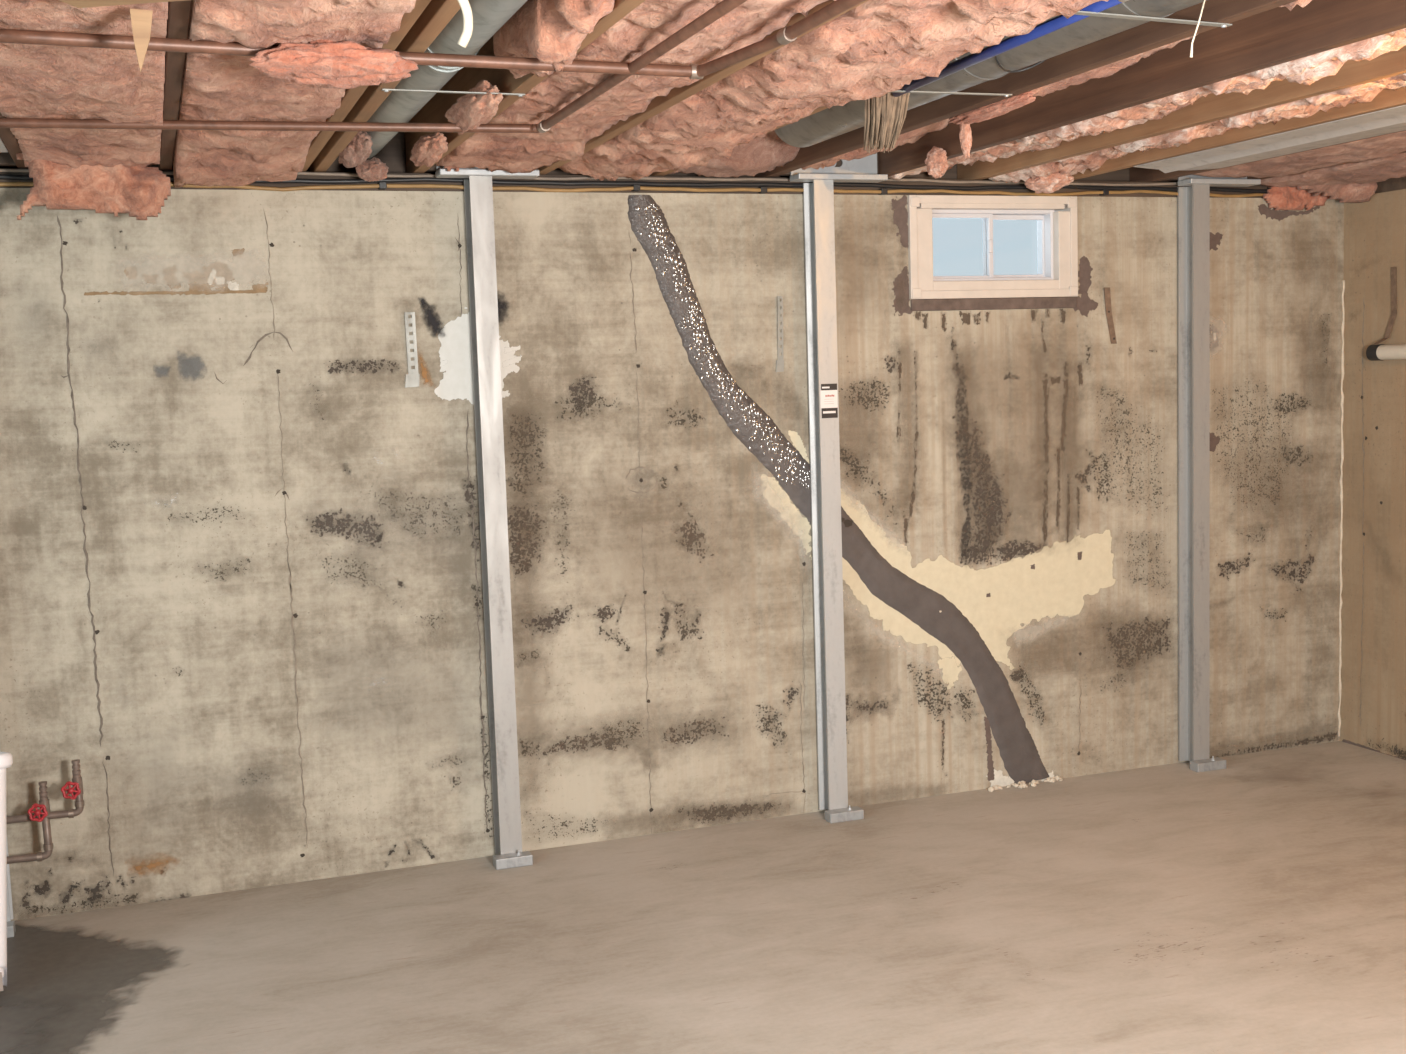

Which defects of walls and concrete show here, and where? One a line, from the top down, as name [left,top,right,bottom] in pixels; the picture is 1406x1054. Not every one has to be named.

water stain [502,390,575,583]
water stain [555,376,620,419]
crack [626,195,1049,833]
water stain [838,351,919,543]
water stain [915,309,1091,567]
spalling [1075,449,1120,529]
water stain [1212,381,1313,512]
water stain [520,721,644,759]
water stain [752,681,799,750]
crack [1075,651,1083,755]
water stain [678,800,781,824]
water stain [0,870,175,1054]